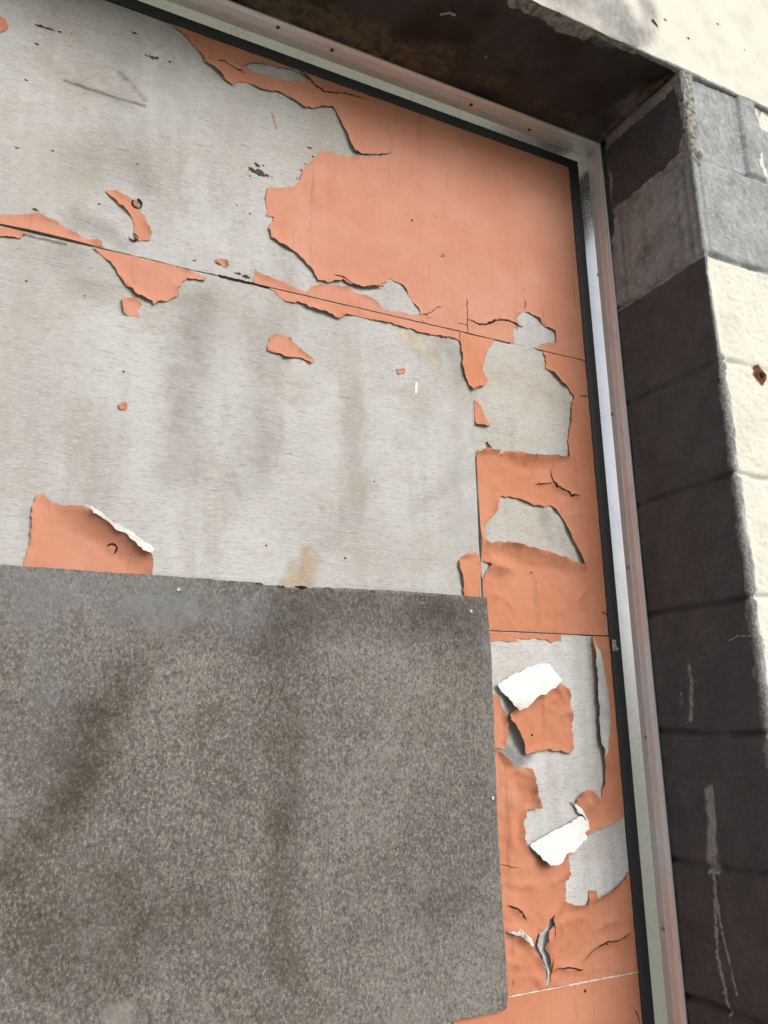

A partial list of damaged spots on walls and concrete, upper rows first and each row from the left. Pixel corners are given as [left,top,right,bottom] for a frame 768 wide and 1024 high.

peeling [0,0,581,597]
crack [334,274,384,288]
crack [460,301,526,335]
crack [535,469,580,497]
peeling [490,632,629,906]
peeling [508,918,553,985]
crack [550,933,630,982]